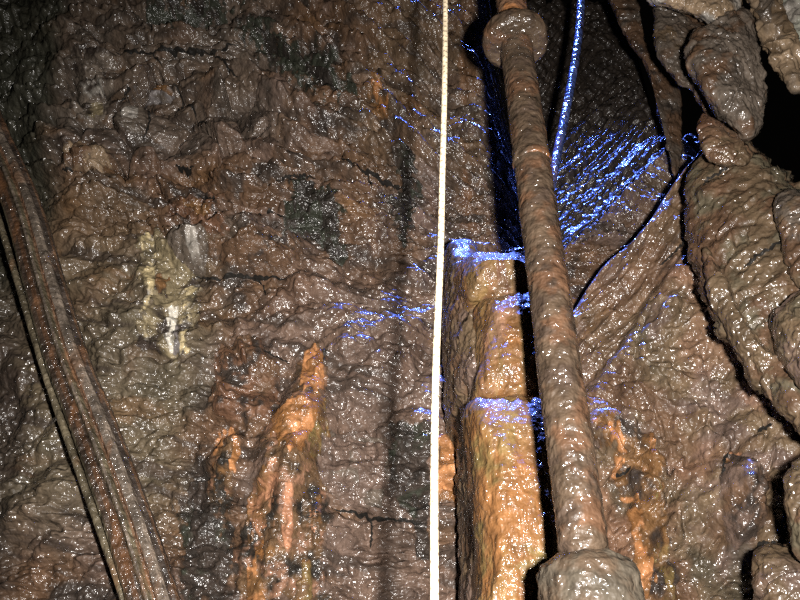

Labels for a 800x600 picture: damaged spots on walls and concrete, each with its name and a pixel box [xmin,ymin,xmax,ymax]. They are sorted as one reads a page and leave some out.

water stain [283,177,348,266]
water stain [132,227,201,365]
rust [205,427,241,522]
rust [232,342,334,600]
crack [332,508,428,548]
rust [592,409,680,600]